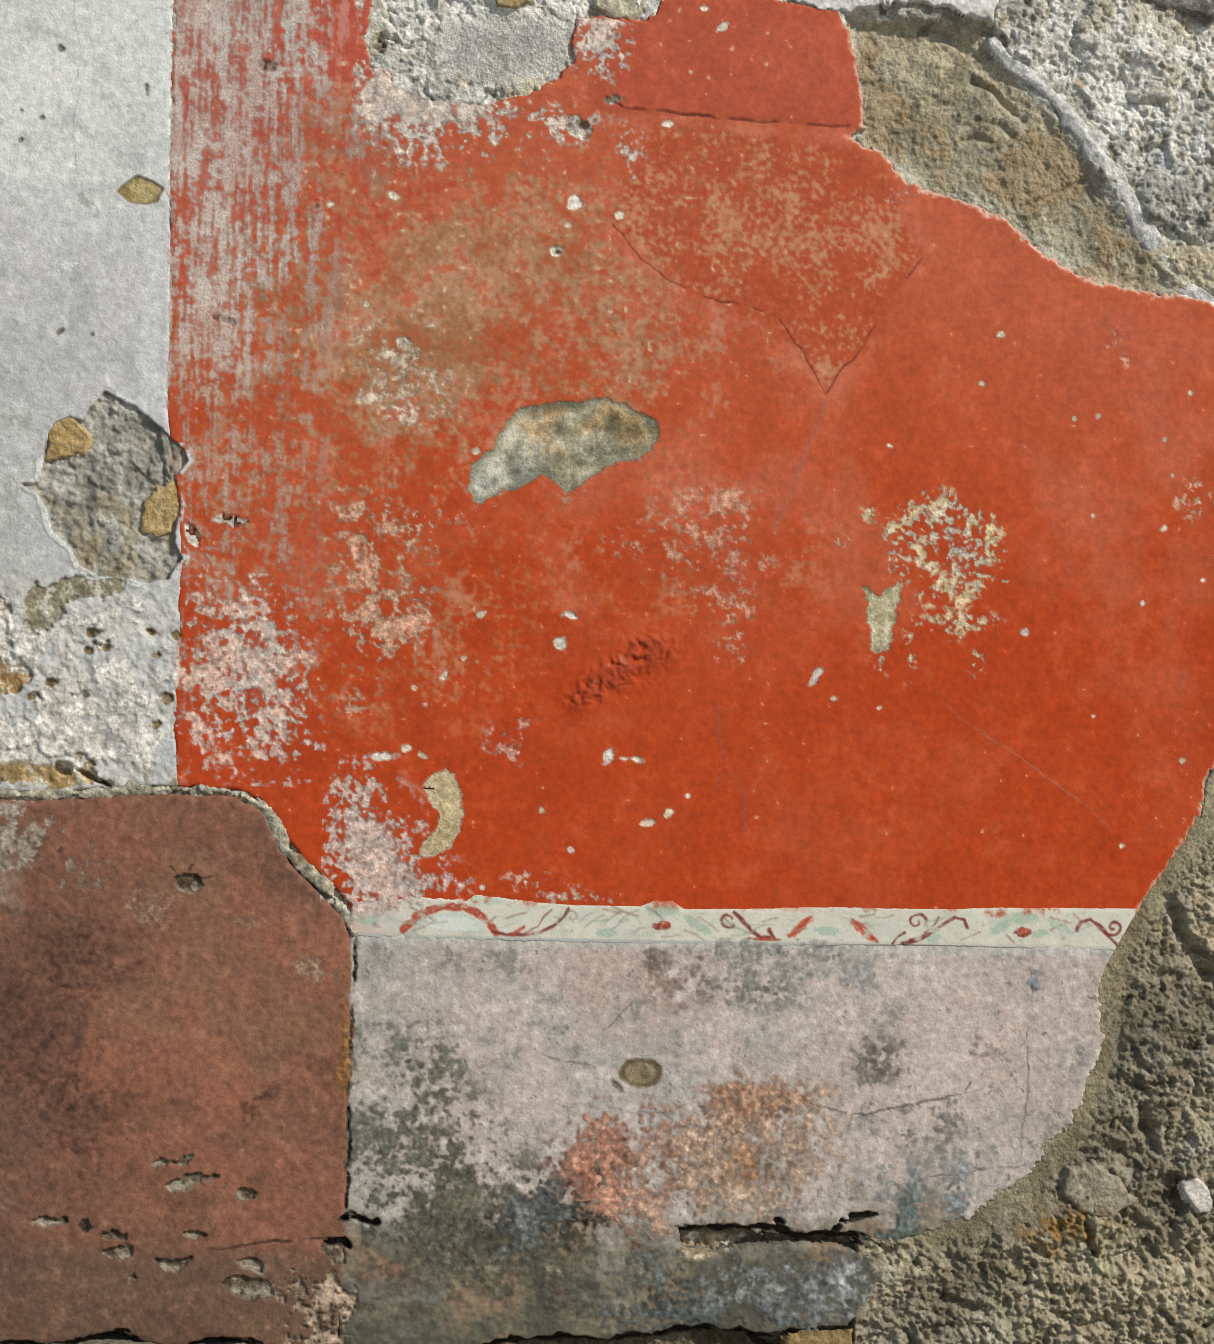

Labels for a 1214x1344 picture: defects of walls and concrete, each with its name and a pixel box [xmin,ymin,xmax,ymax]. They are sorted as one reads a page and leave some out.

crack [614,101,776,123]
spalling [0,0,659,790]
peeling [1174,482,1211,519]
peeling [862,487,1009,671]
peeling [0,800,65,872]
peeling [321,745,485,927]
peeling [506,871,612,903]
peeling [152,1154,219,1193]
peeling [31,1216,133,1259]
crack [679,1211,878,1245]
peeling [222,1237,357,1344]
crack [483,1323,773,1344]